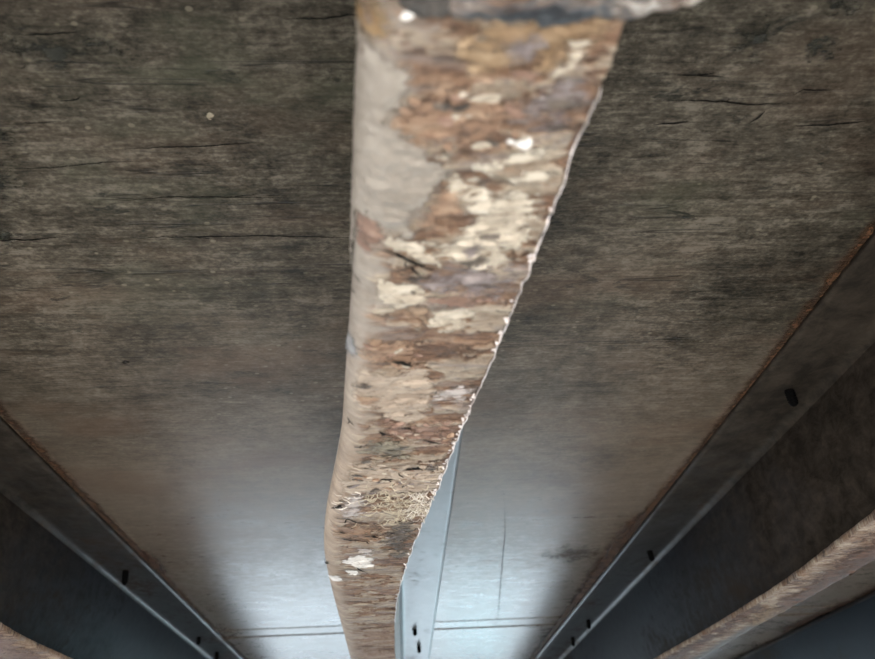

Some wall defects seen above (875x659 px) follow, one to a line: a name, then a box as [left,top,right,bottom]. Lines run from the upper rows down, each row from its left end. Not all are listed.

crack [290,13,353,21]
crack [24,29,86,37]
crack [683,71,725,79]
crack [652,89,827,126]
crack [803,119,874,127]
crack [17,142,257,169]
crack [125,193,283,201]
crack [0,234,67,242]
crack [196,235,362,293]
peeling [339,18,601,622]
peeling [328,549,374,581]
peeling [732,533,875,623]